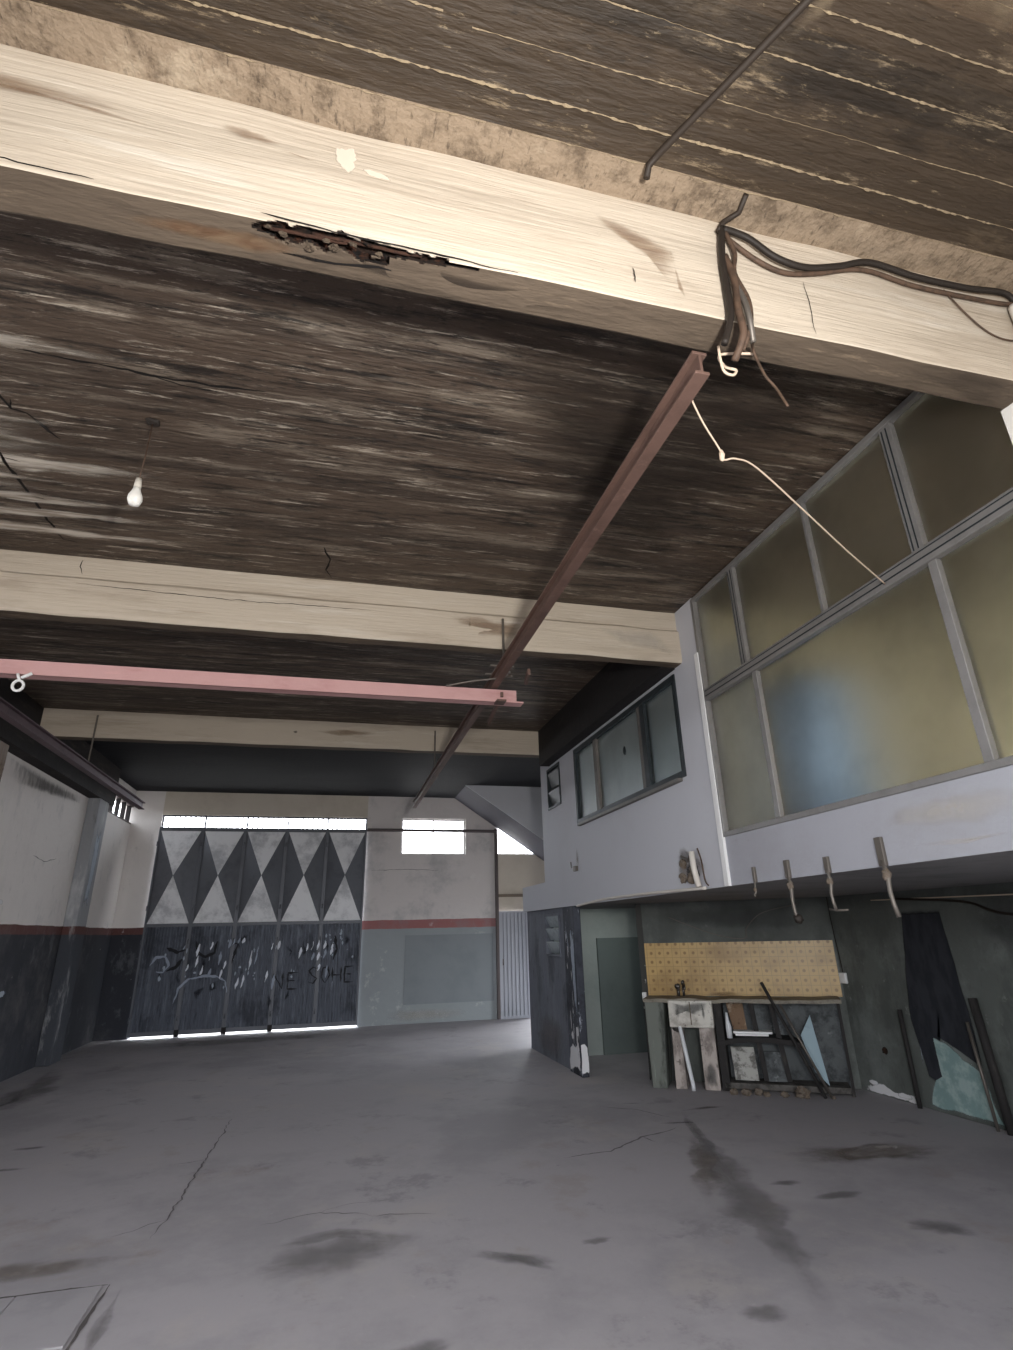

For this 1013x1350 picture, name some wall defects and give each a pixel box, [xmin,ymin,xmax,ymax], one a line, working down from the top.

spalling [251,212,518,284]
crack [15,348,265,393]
crack [0,395,62,439]
crack [0,452,362,610]
crack [116,1119,232,1238]